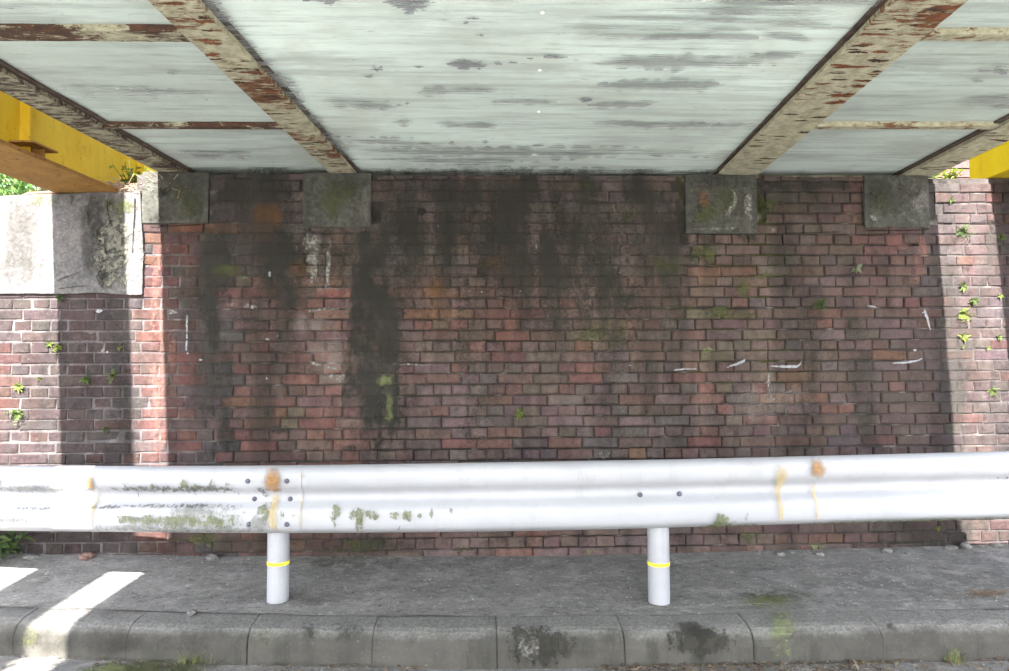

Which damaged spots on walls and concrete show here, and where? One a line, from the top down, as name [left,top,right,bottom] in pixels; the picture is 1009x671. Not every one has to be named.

water stain [577,0,874,42]
water stain [202,0,724,177]
water stain [596,52,800,90]
water stain [276,228,336,306]
water stain [310,214,404,428]